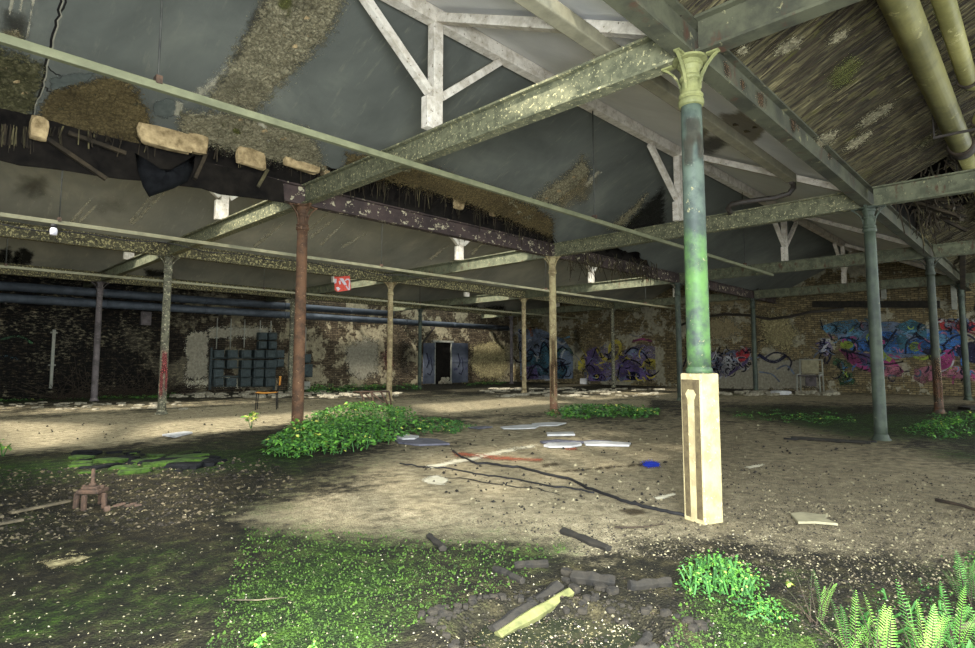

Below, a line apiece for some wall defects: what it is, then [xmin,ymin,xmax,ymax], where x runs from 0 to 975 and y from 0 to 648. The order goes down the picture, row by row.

crack [32,0,67,115]
spalling [0,0,355,176]
spalling [378,155,599,240]